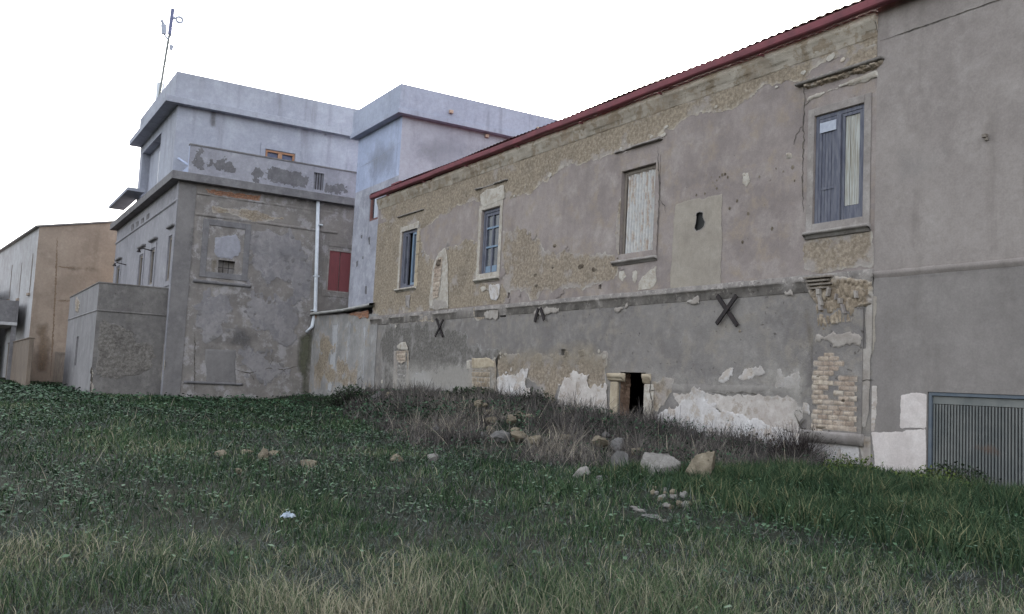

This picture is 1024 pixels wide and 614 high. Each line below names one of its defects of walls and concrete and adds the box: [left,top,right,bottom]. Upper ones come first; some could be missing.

peeling [192,147,236,173]
flaking render [349,37,883,412]
crack [794,87,810,210]
flaking render [652,300,873,466]